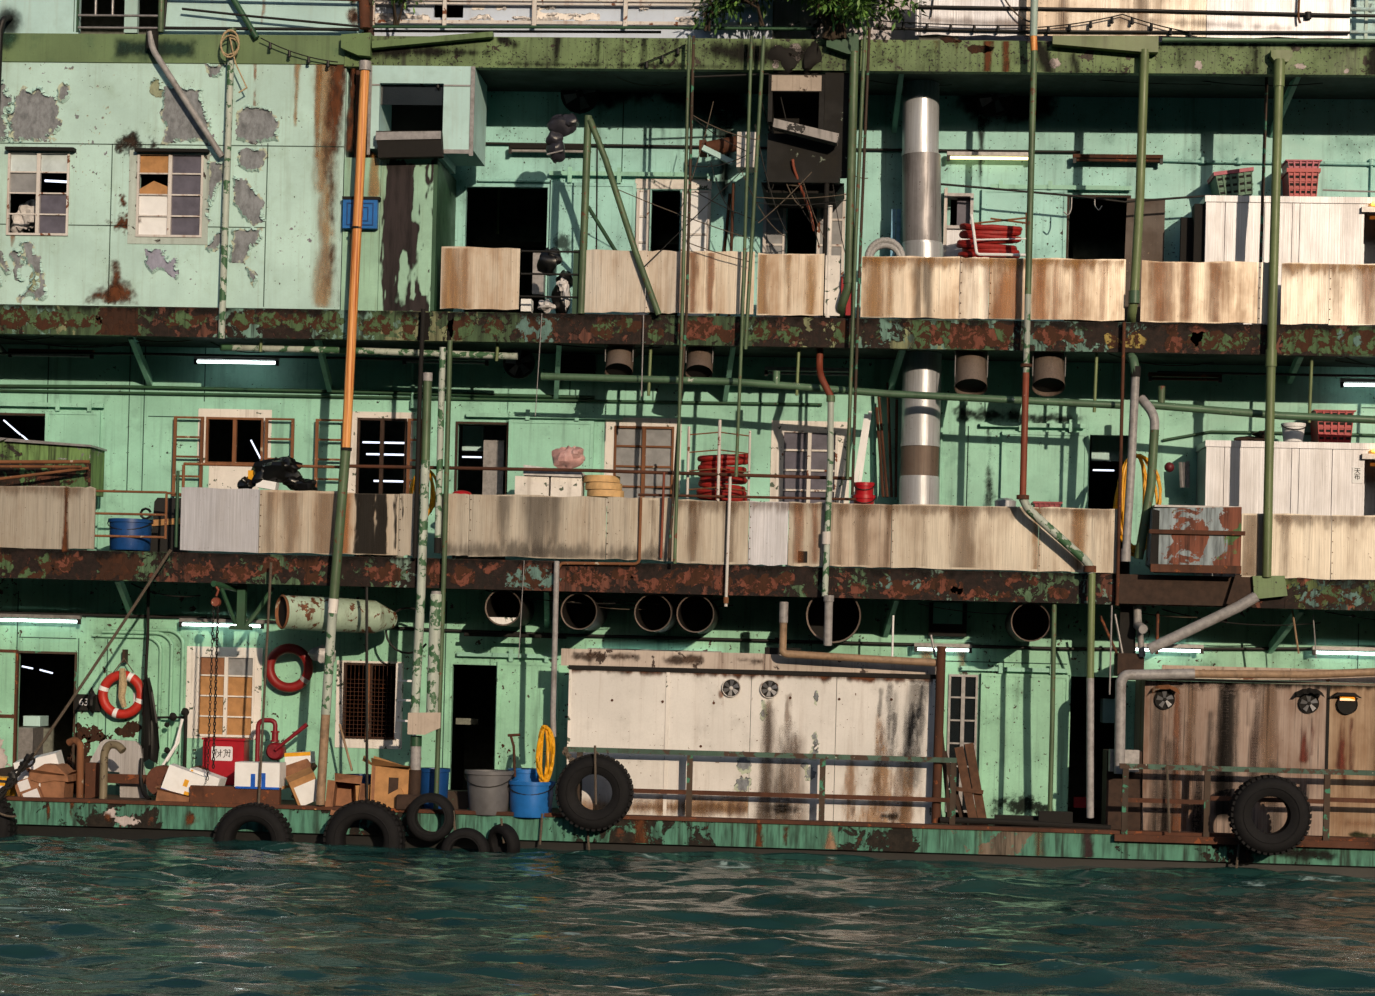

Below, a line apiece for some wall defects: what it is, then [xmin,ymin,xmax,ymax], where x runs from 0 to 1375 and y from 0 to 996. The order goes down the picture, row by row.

peeling [470,5,600,21]
peeling [0,64,111,147]
peeling [144,63,280,288]
rust [315,64,355,305]
water stain [420,159,434,214]
rust [89,261,132,303]
rust [993,259,1056,319]
rust [1154,262,1166,321]
peeling [0,739,11,768]
water stain [757,703,790,819]
water stain [907,694,922,752]
rust [1337,723,1353,780]